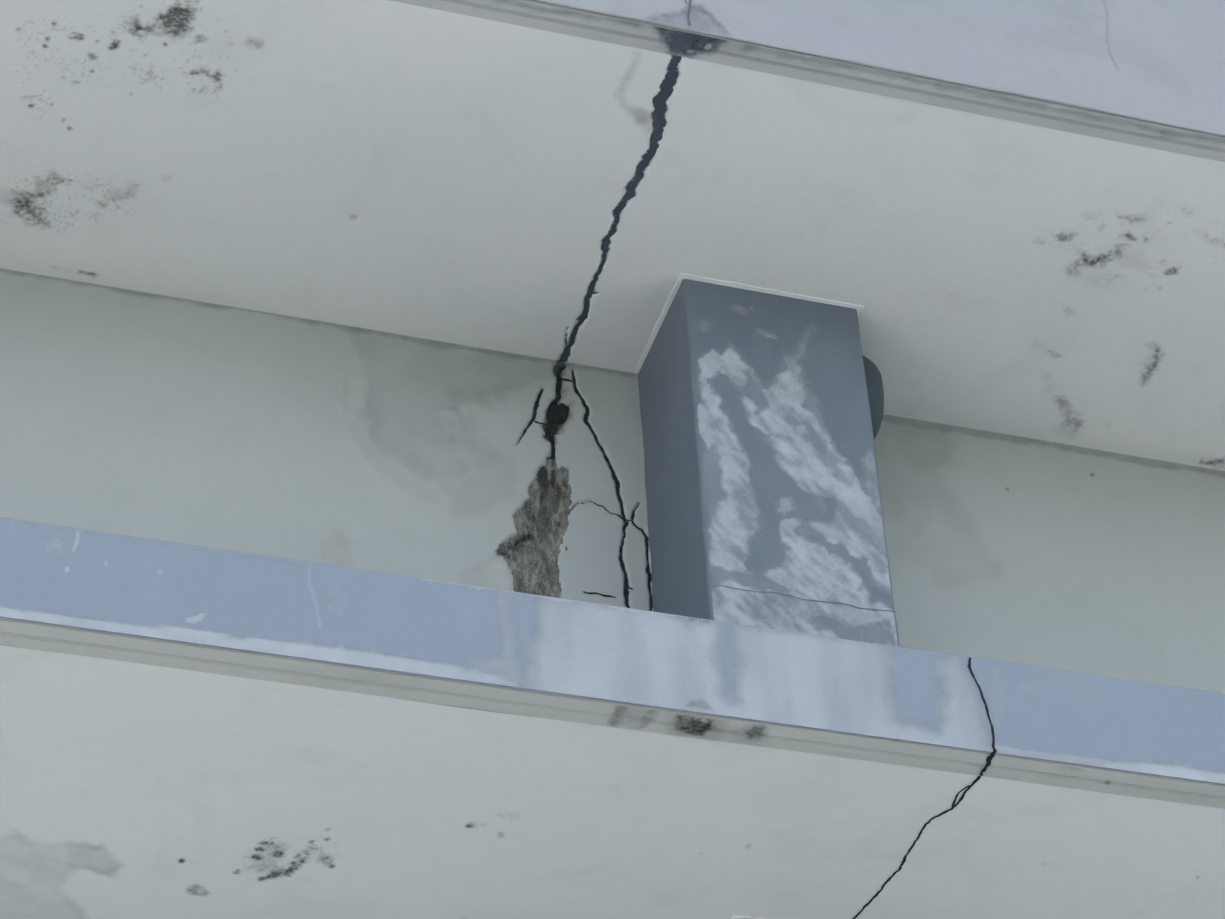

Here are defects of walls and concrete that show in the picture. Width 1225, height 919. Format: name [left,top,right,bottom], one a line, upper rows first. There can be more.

mould [137,7,192,33]
crack [684,0,692,25]
leakage [16,194,43,216]
crack [518,55,682,611]
peeling [0,347,1225,784]
crack [713,585,897,612]
crack [852,657,997,919]
leakage [252,842,304,881]